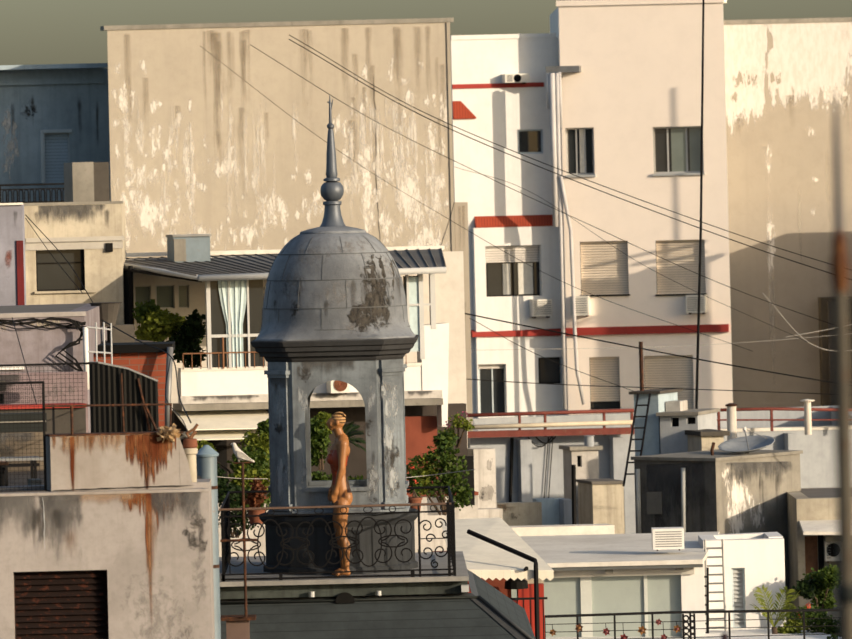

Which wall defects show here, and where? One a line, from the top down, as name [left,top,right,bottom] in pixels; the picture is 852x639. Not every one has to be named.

peeling [724,22,852,135]
peeling [112,81,323,251]
peeling [333,57,448,252]
water stain [347,255,400,332]
water stain [0,495,81,533]
rust [52,434,178,598]
water stain [152,492,207,551]
water stain [726,461,791,486]